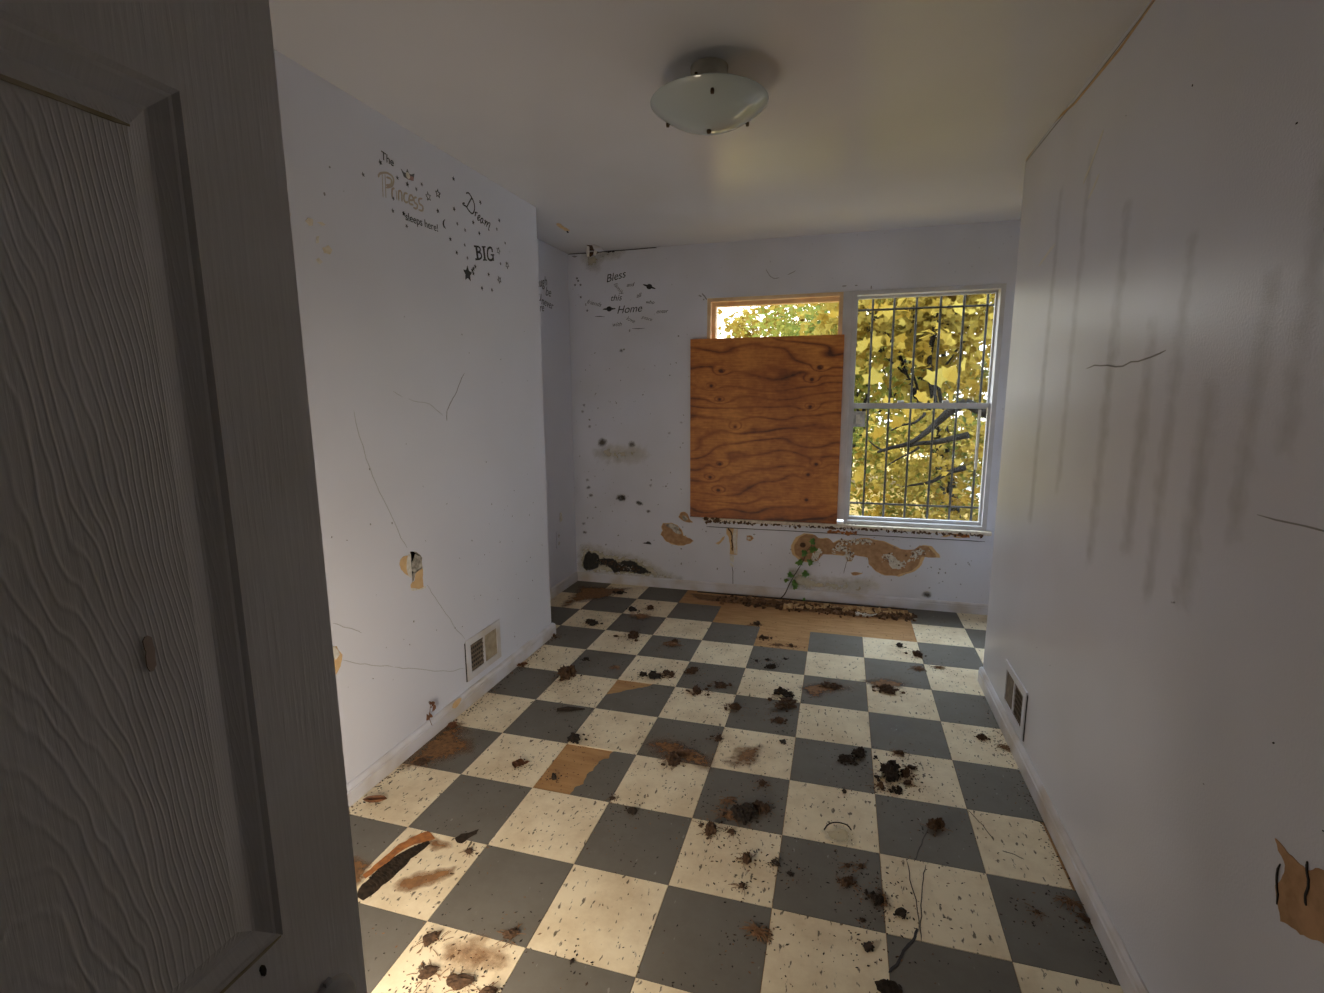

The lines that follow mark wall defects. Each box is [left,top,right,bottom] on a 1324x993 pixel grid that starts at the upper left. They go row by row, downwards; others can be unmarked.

damp [563,439,659,606]
peeling [644,512,693,546]
spalling [400,551,426,591]
peeling [791,533,940,577]
crack [334,585,465,672]
peeling [333,646,342,674]
spalling [1275,838,1324,944]